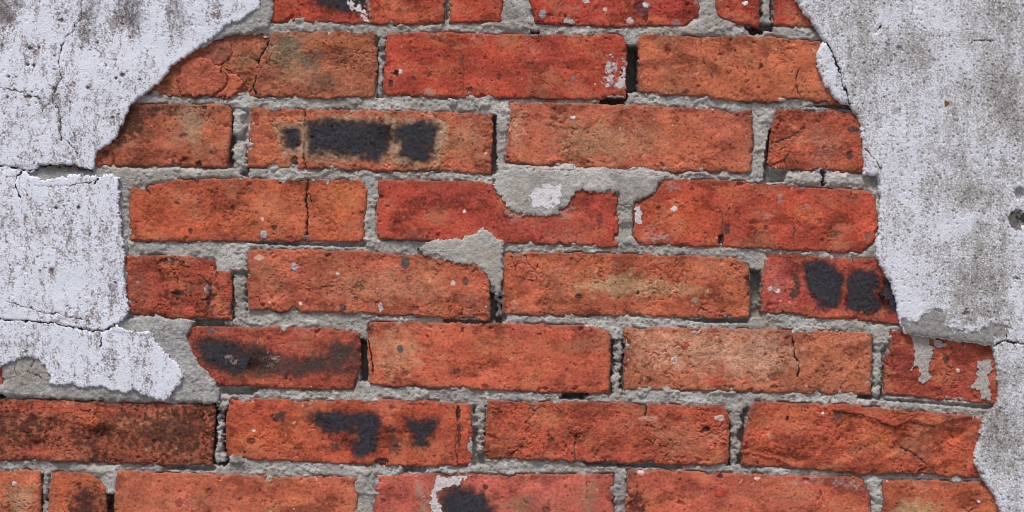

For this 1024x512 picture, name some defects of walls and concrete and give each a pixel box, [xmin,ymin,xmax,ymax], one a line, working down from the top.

crack [0,0,99,198]
spalling [176,0,274,99]
crack [221,34,272,95]
peeling [601,54,627,98]
flaking render [28,163,129,280]
peeling [634,205,642,224]
flaking render [0,300,221,405]
flaking render [901,308,1011,347]
peeling [429,475,471,512]